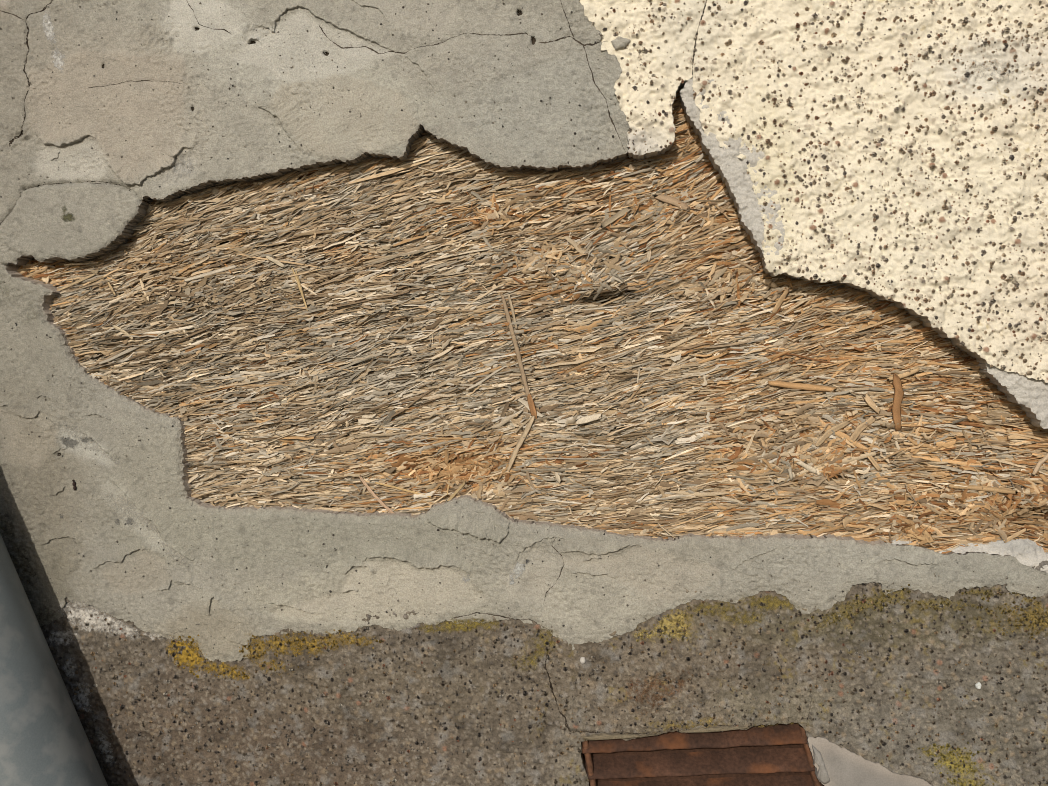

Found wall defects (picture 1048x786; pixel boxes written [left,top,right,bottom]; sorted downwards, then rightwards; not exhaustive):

crack [0,0,53,147]
crack [319,0,626,152]
spalling [6,76,1048,573]